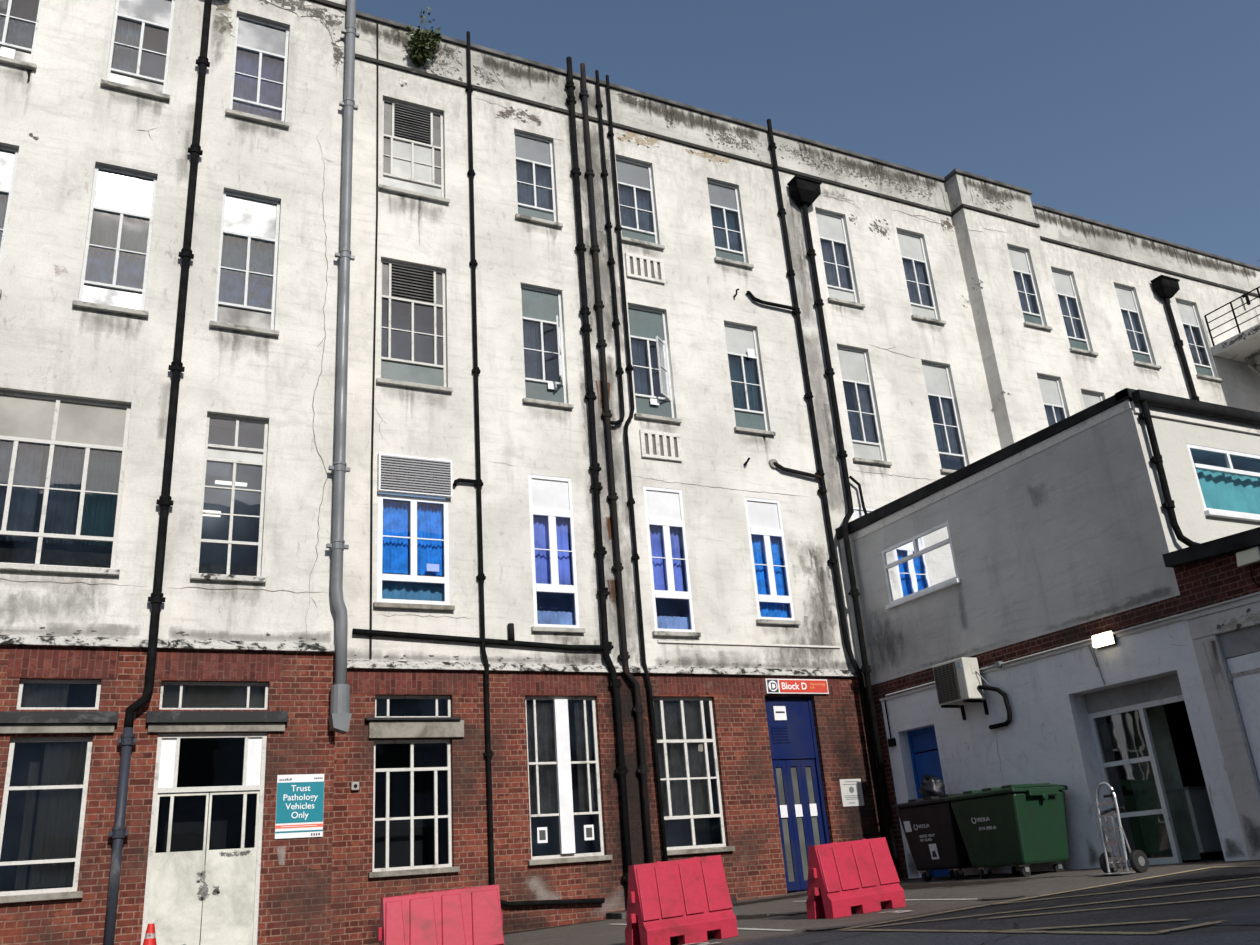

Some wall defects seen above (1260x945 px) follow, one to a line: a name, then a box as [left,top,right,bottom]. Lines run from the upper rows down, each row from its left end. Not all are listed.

flaking render [216,0,236,37]
flaking render [256,0,345,66]
flaking render [495,106,541,126]
water stain [621,95,757,139]
water stain [800,143,935,187]
crack [169,136,329,631]